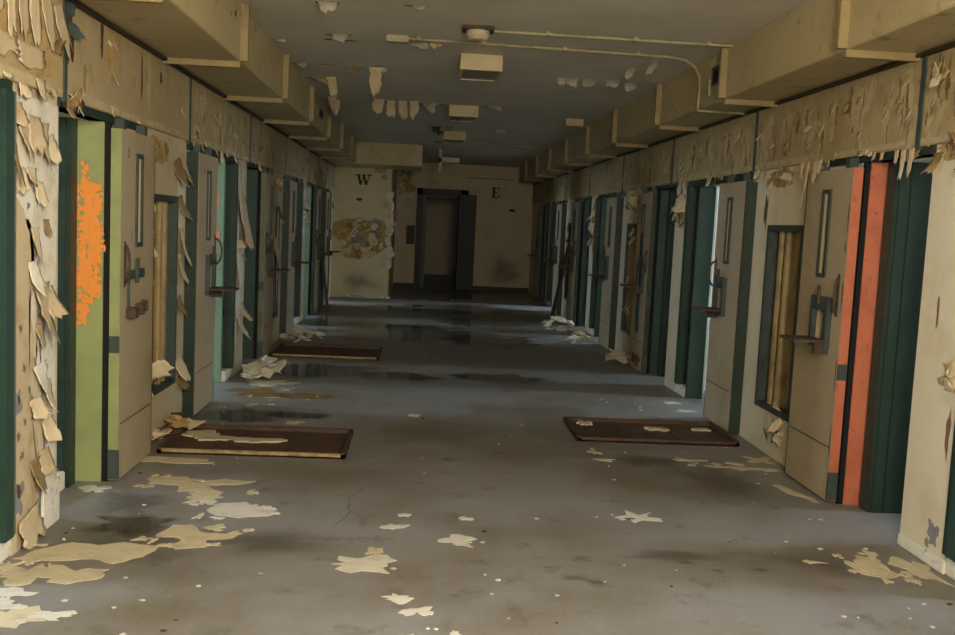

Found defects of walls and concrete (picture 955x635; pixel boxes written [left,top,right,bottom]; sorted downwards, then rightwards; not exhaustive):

peeling [315,1,339,14]
peeling [295,62,340,116]
peeling [348,65,444,120]
peeling [326,169,417,270]
peeling [586,52,955,338]
peeling [0,0,311,550]
peeling [39,564,109,584]
peeling [844,555,955,587]